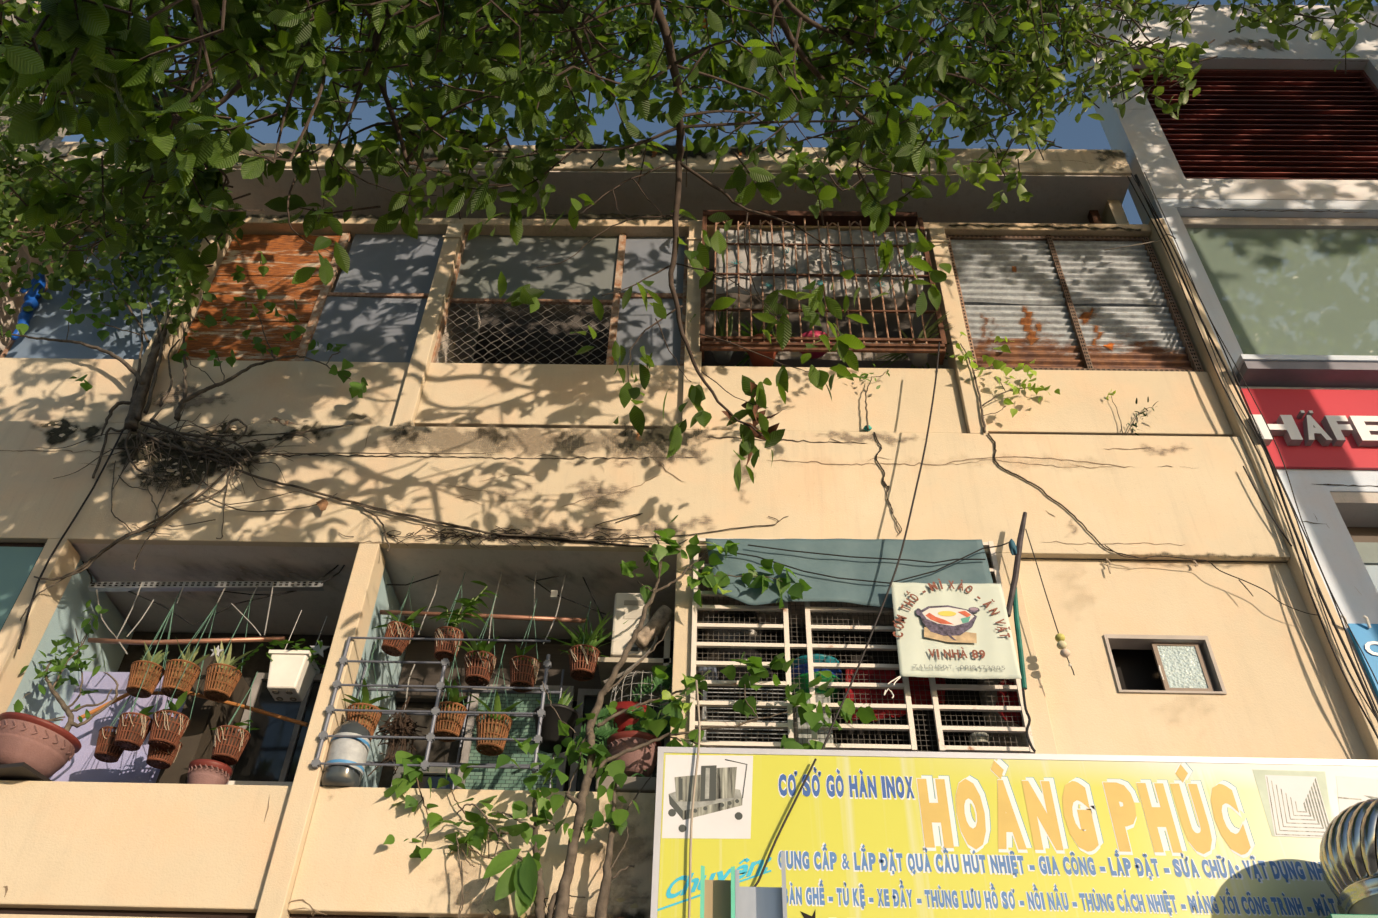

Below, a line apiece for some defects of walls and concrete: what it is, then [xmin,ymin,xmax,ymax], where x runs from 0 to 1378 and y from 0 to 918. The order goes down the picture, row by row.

corrosion [1020,306,1042,345]
corrosion [1079,308,1114,350]
leakage [382,422,714,466]
crack [259,429,1193,507]
leakage [499,482,711,544]